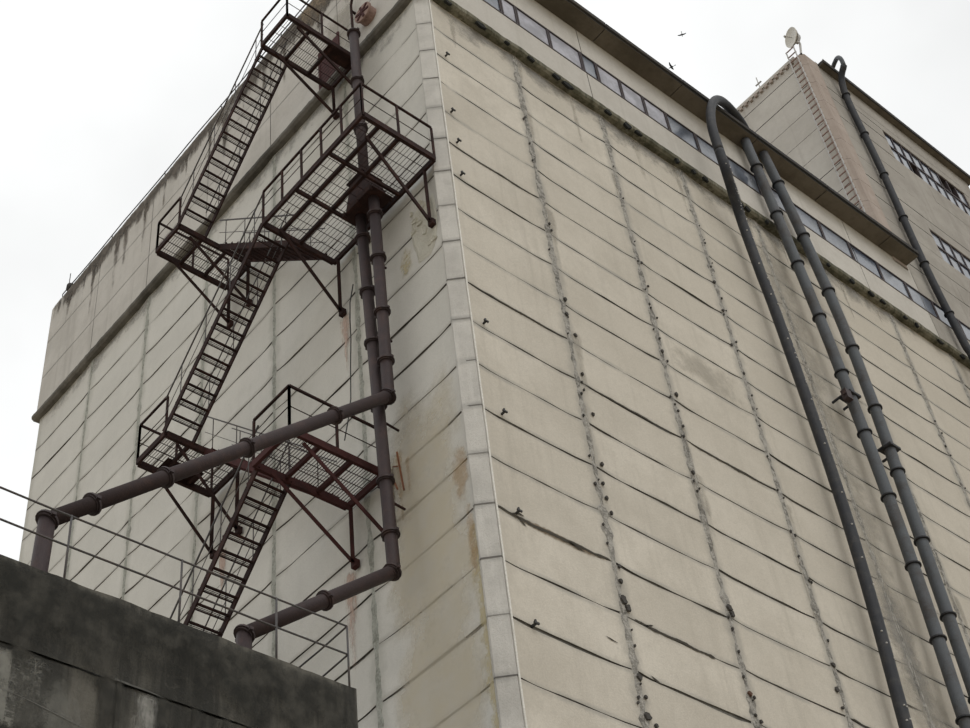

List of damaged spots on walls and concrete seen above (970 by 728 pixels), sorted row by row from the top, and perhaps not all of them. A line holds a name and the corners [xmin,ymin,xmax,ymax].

water stain [55,0,330,311]
water stain [0,558,348,728]